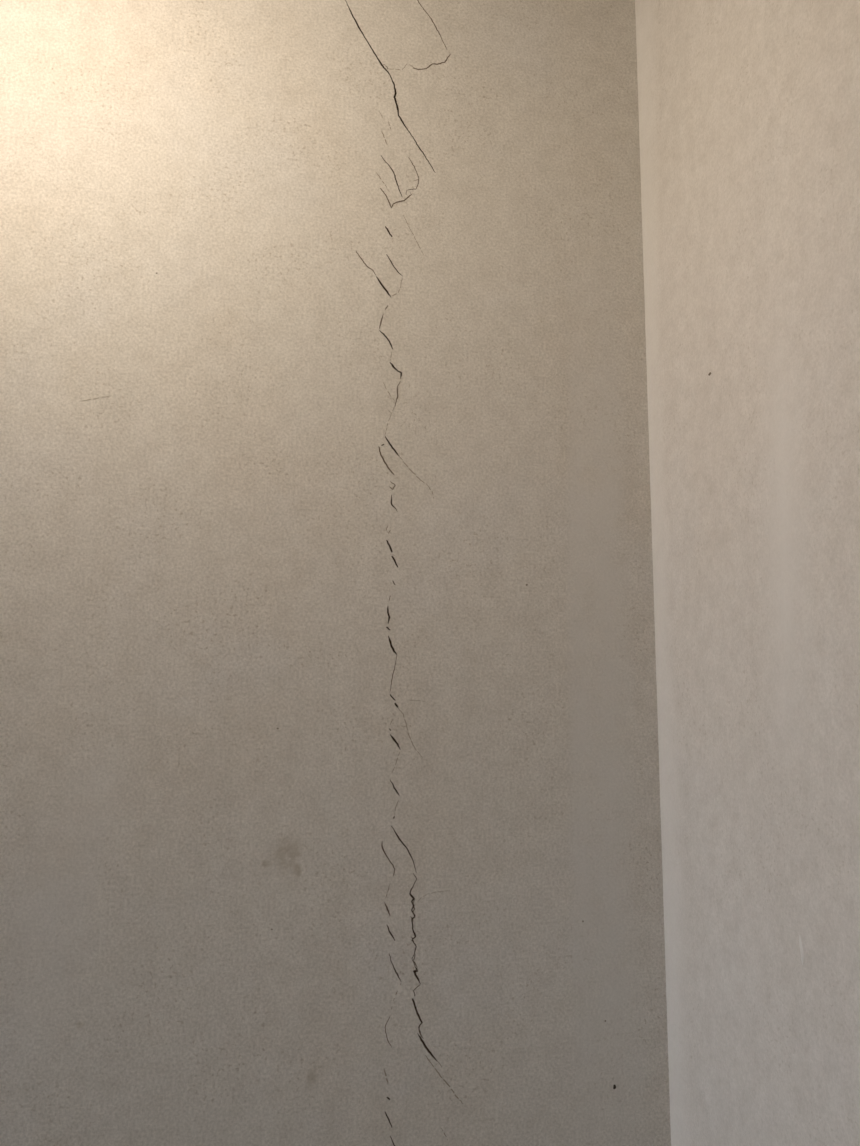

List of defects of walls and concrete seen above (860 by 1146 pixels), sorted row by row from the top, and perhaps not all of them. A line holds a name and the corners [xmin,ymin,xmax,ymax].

crack [345,0,463,1146]